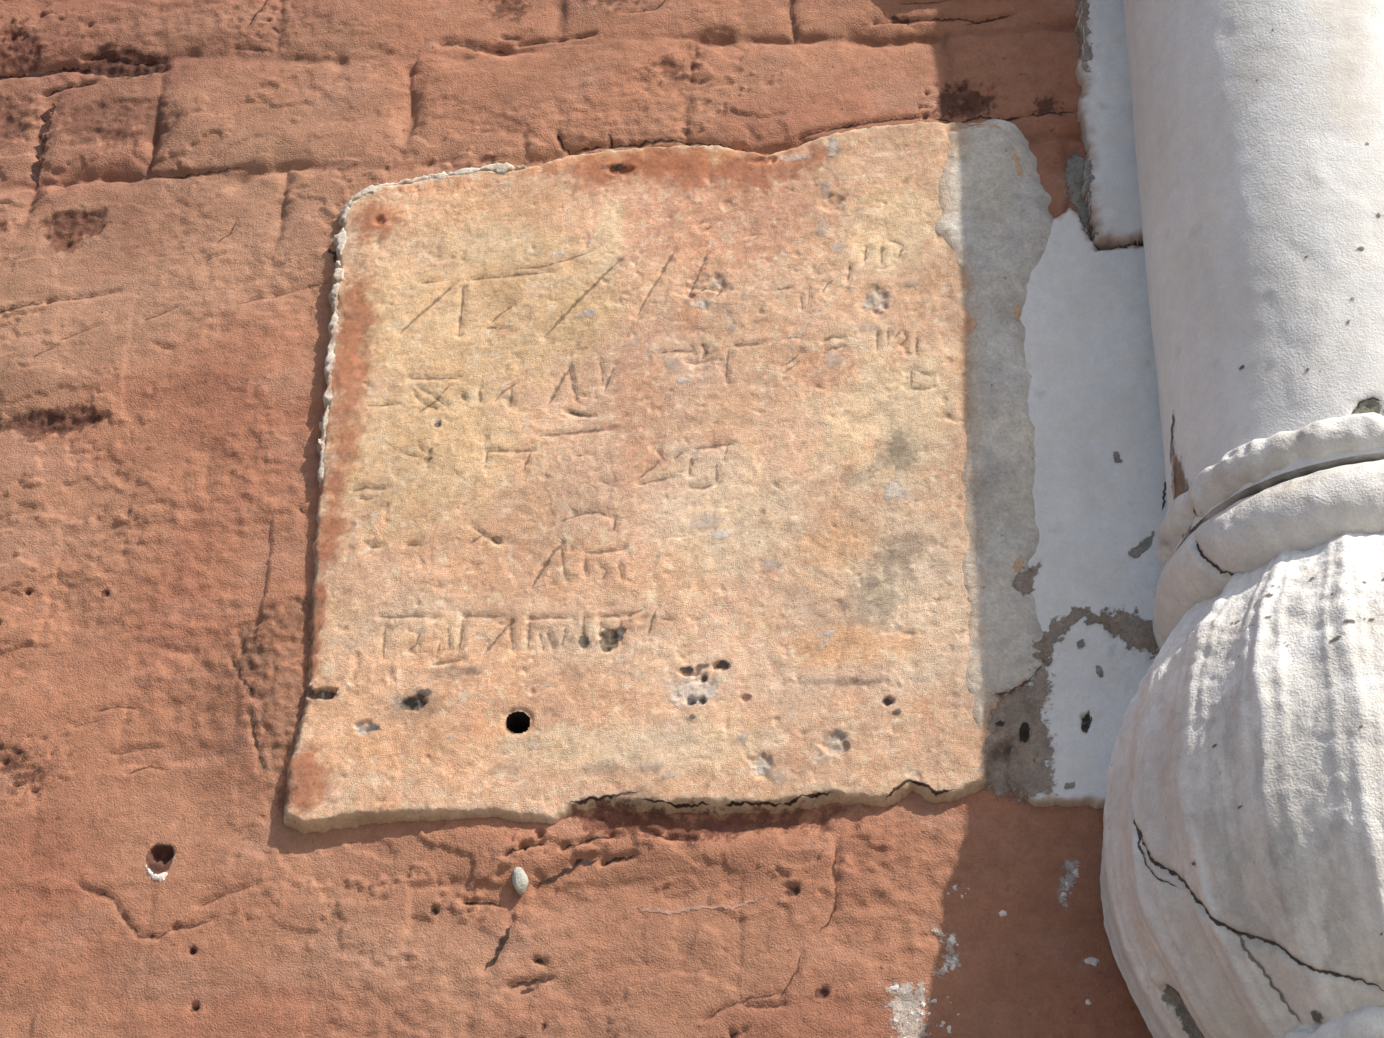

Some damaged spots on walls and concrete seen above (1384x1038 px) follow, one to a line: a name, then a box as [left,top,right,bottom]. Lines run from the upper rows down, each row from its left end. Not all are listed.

spalling [1352,397,1382,414]
peeling [1013,563,1041,595]
spalling [979,607,1159,804]
crack [1133,819,1384,1021]